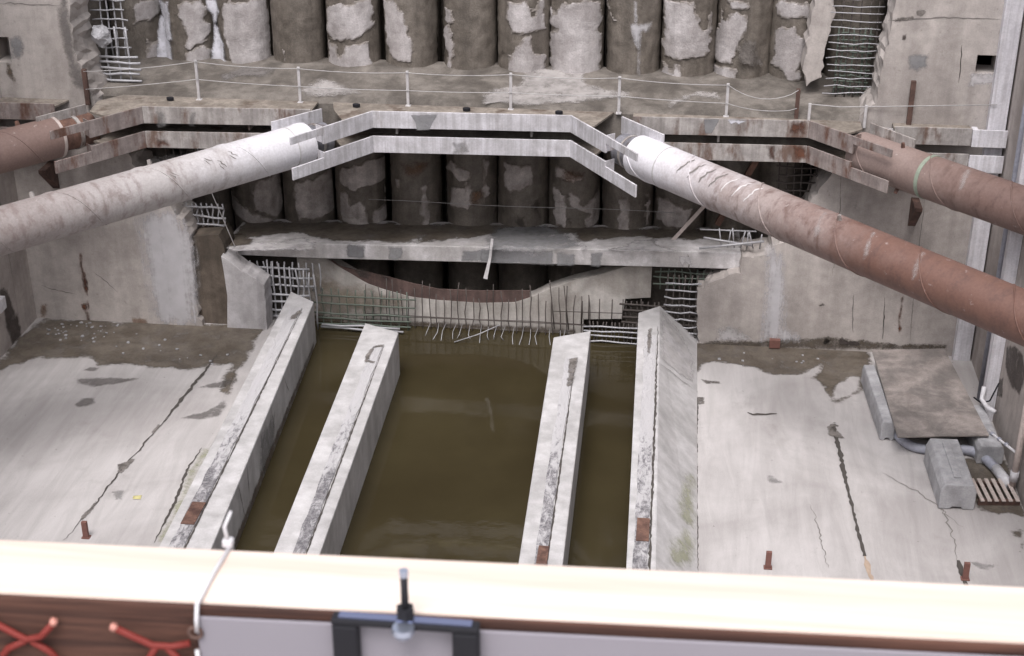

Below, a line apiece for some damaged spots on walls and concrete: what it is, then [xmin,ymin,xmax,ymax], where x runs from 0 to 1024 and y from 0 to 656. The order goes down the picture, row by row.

spalling [90,0,160,83]
peeling [326,0,414,67]
peeling [443,7,455,68]
peeling [506,0,617,74]
spalling [822,0,926,98]
peeling [446,157,491,211]
peeling [552,164,600,228]
spalling [249,259,713,353]
water stain [79,368,134,386]
crack [65,355,217,543]
crack [827,422,874,580]
crack [886,474,968,585]